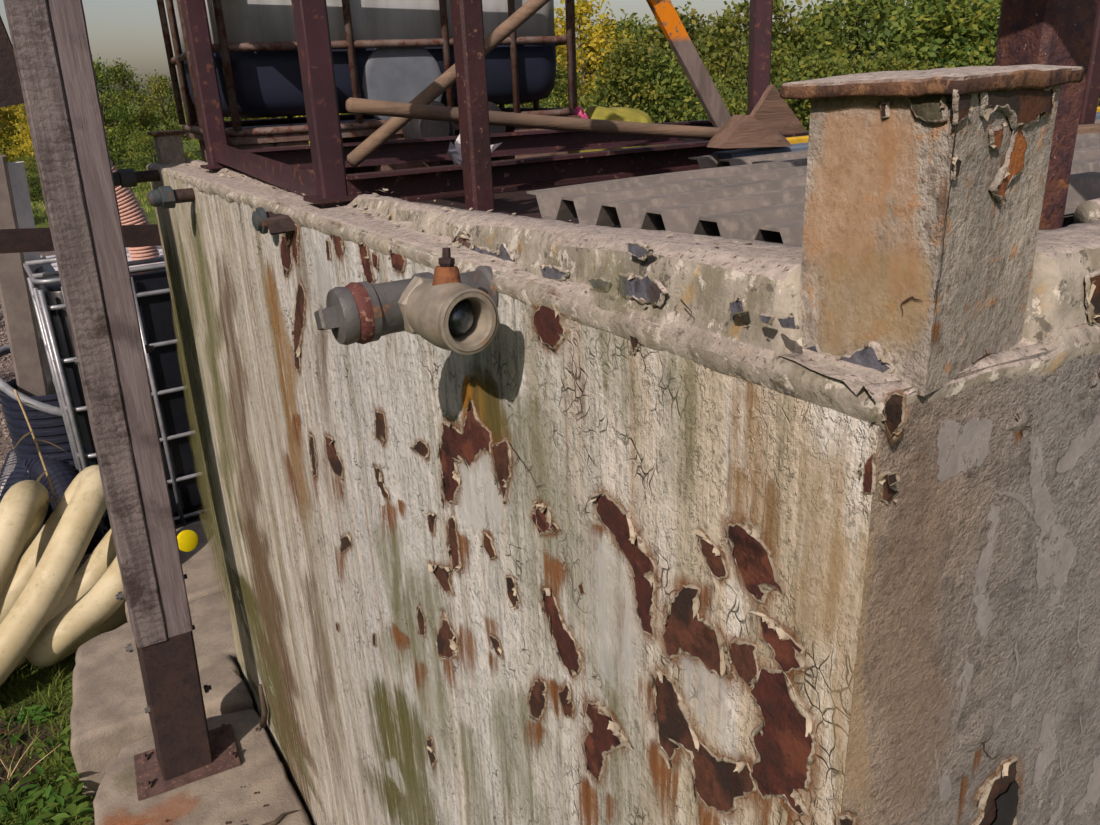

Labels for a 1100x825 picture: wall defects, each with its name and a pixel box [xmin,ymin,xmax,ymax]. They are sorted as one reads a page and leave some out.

peeling [880,102,890,119]
peeling [907,86,1055,205]
peeling [419,228,523,267]
peeling [533,264,570,352]
peeling [582,241,668,307]
peeling [1085,269,1100,326]
peeling [410,397,513,595]
peeling [505,575,521,609]
peeling [527,585,632,782]
peeling [587,490,819,817]
leakage [376,680,410,815]
peeling [977,762,1011,812]